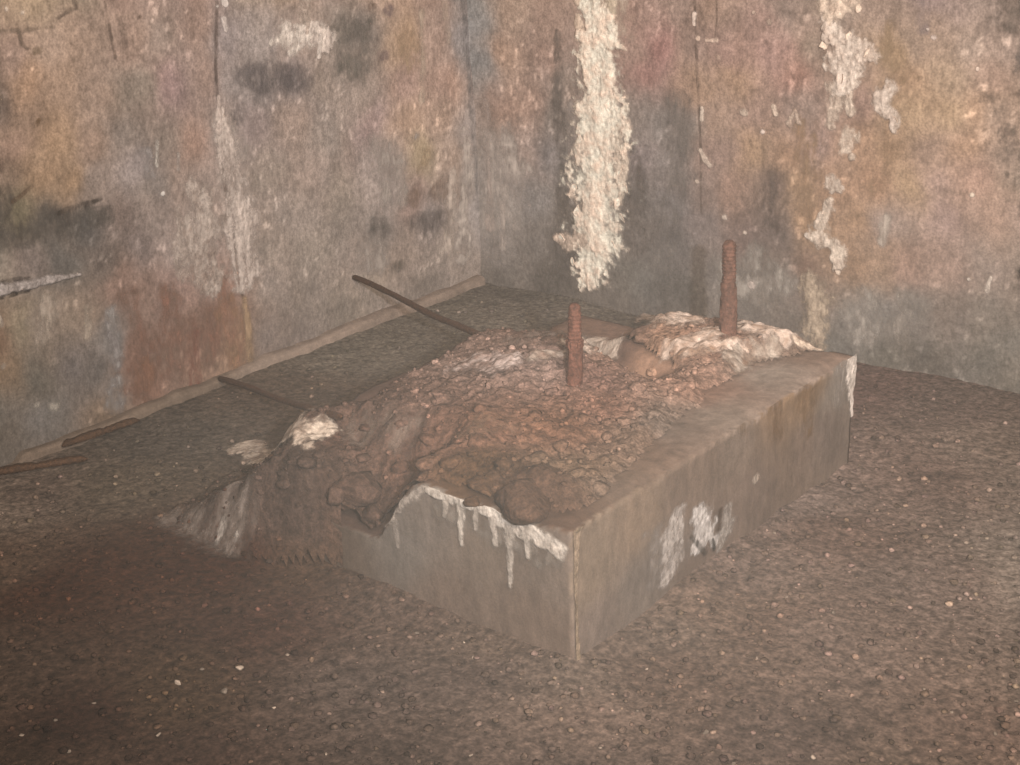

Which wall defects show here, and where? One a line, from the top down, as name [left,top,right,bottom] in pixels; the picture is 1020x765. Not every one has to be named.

crack [212,21,220,84]
damp [552,0,646,292]
damp [818,0,880,161]
damp [873,79,900,133]
damp [806,174,847,275]
crack [0,273,82,299]
rust [352,275,480,335]
damp [389,485,583,660]
damp [644,503,734,588]